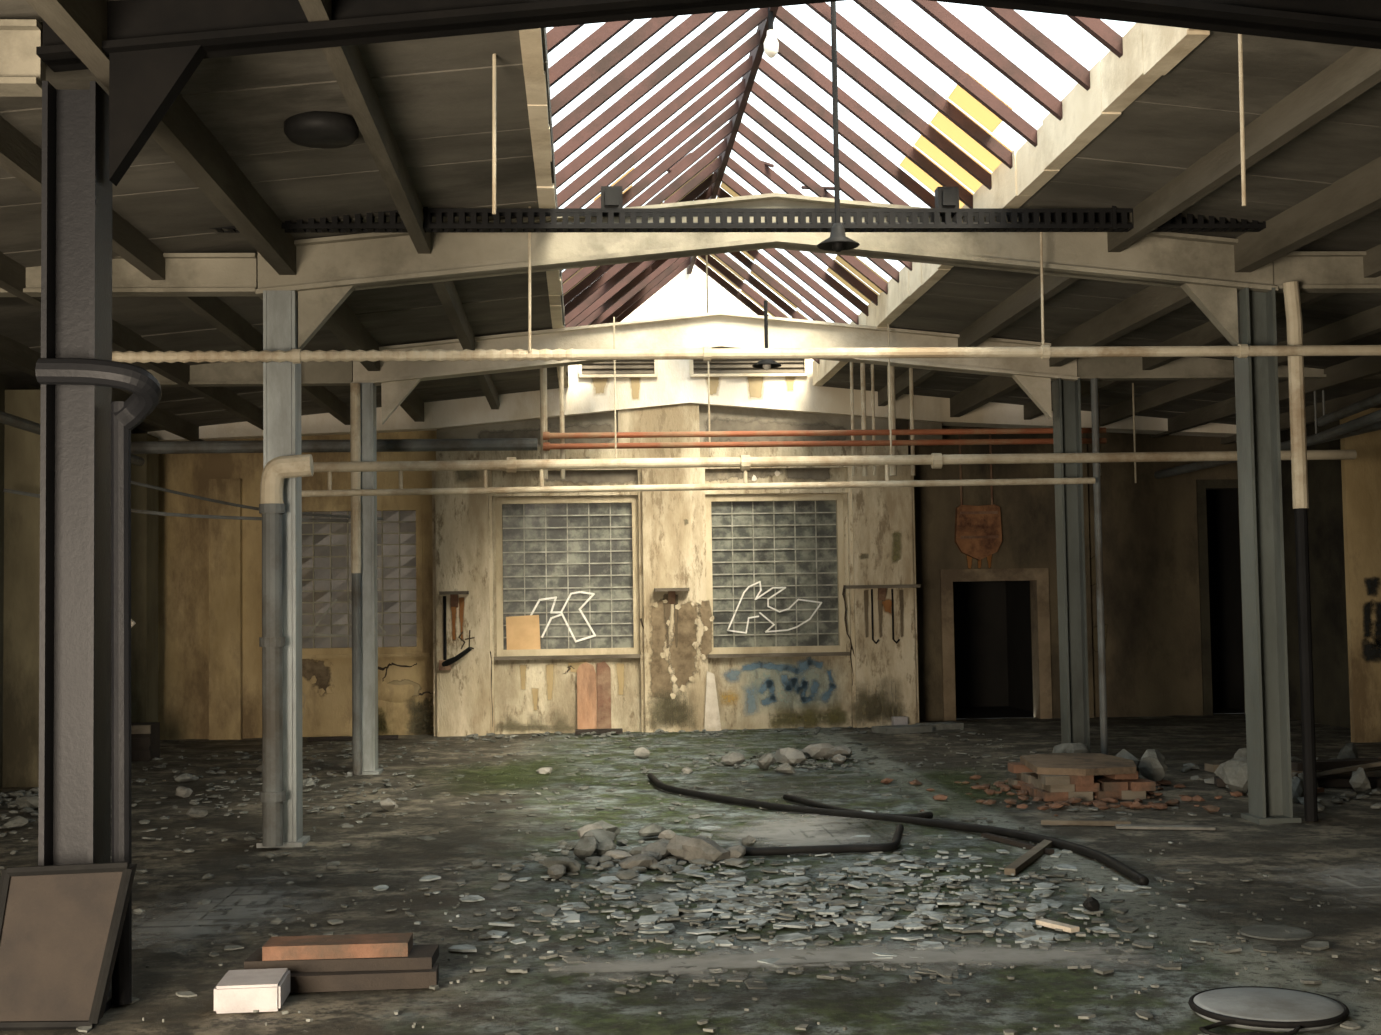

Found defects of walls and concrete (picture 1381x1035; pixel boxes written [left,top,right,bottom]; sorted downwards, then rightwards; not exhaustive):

corrosion [450,597,465,641]
corrosion [864,590,903,637]
peeling [649,599,714,699]